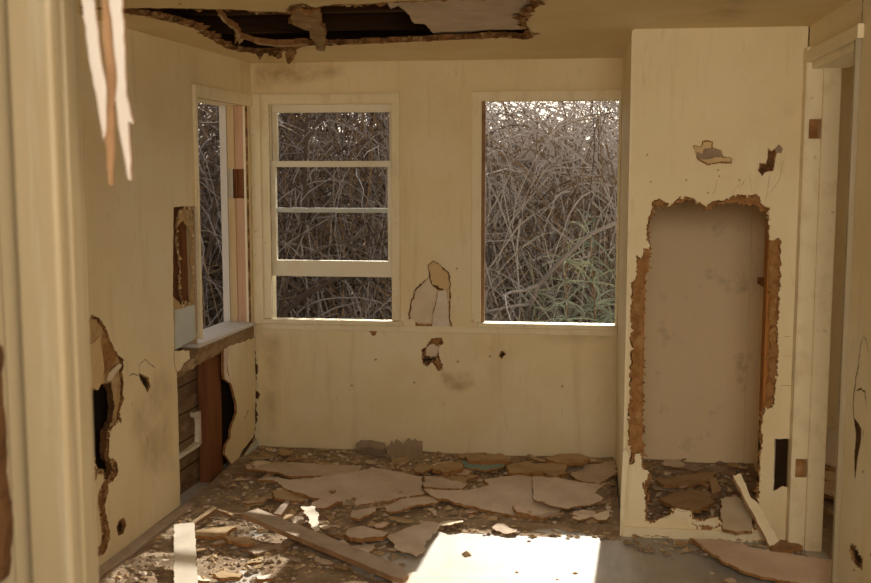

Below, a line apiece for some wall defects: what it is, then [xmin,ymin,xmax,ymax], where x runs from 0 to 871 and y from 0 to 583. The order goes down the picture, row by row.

spalling [693,140,732,177]
hole [758,145,783,176]
spalling [175,206,195,308]
peeling [408,261,458,327]
spalling [421,338,443,371]
hole [89,315,156,557]
spalling [854,418,864,475]
peeling [645,508,721,528]